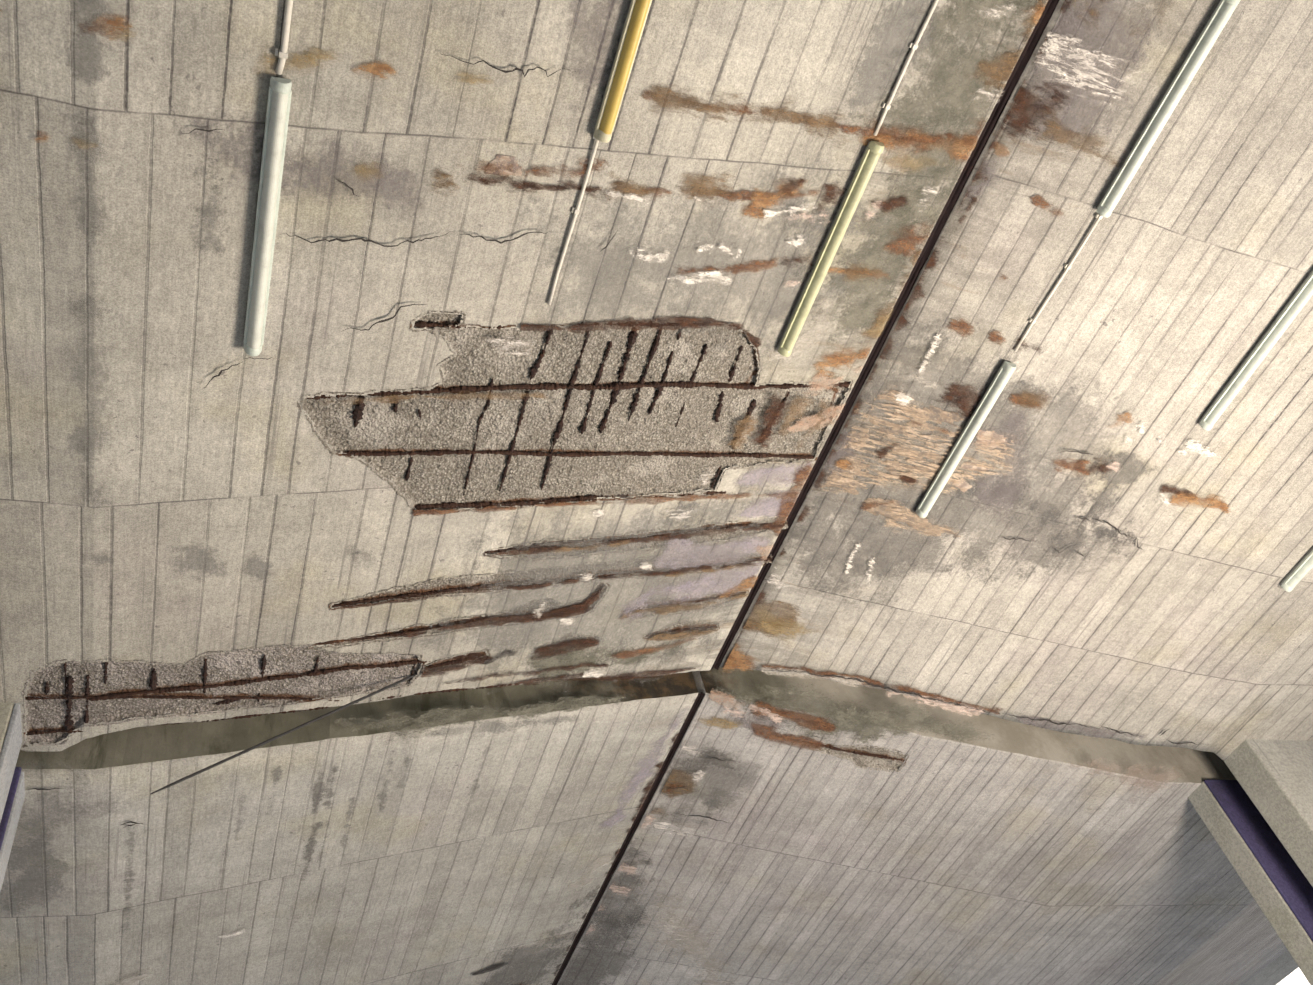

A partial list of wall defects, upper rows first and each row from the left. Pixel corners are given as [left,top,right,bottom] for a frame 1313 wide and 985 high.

crack [341,304,426,332]
crack [280,231,548,247]
crack [441,54,577,77]
rust [434,159,843,218]
spalling [297,311,1014,538]
rust [401,226,1001,714]
rust [642,0,1116,223]
damp [764,0,1045,363]
damp [738,315,1151,594]
spalling [21,520,788,748]
damp [340,695,625,737]
rust [627,691,836,834]